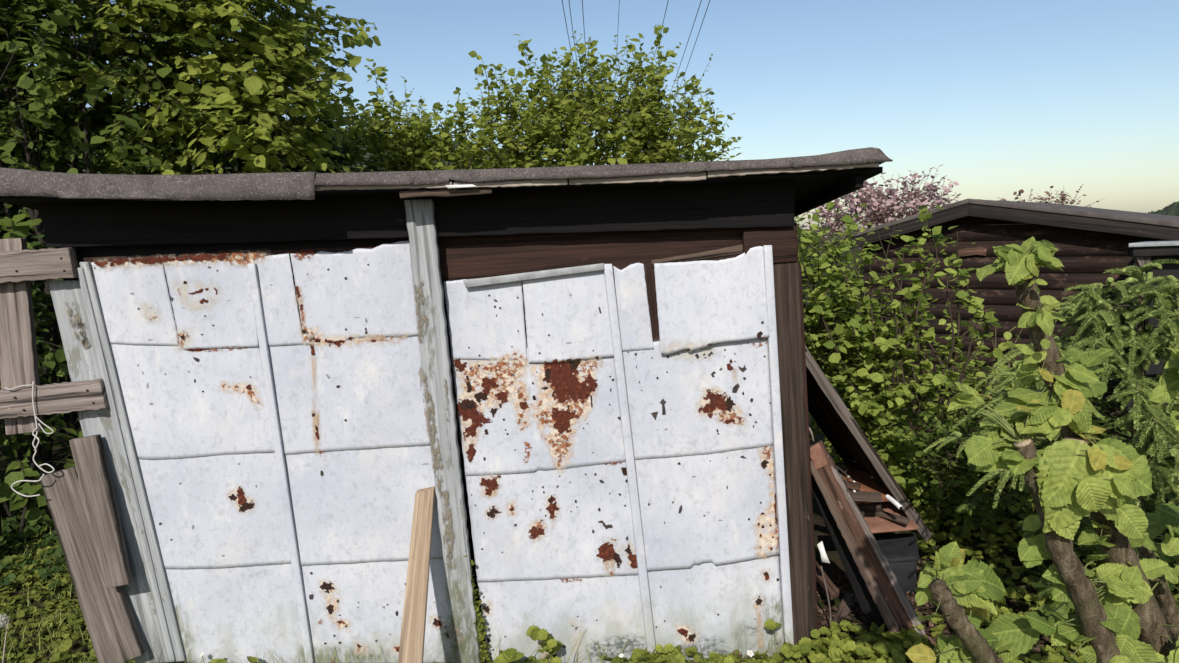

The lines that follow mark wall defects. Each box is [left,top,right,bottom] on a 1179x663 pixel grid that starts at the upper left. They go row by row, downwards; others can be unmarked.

rust [94,251,264,271]
rust [171,281,241,352]
rust [295,286,407,380]
rust [454,353,599,469]
rust [698,389,744,424]
rust [228,486,254,512]
rust [479,475,516,519]
rust [528,494,559,540]
rust [756,446,779,558]
rust [596,536,638,575]
rust [318,581,349,628]
rust [677,626,696,643]